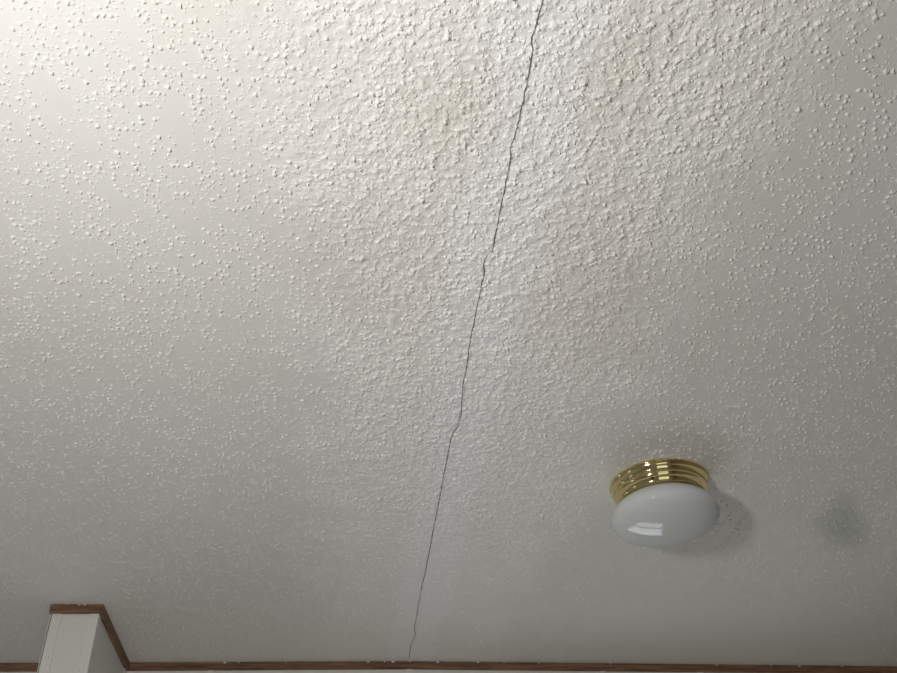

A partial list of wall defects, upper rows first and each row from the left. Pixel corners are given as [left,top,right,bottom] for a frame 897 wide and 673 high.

crack [409,0,543,657]